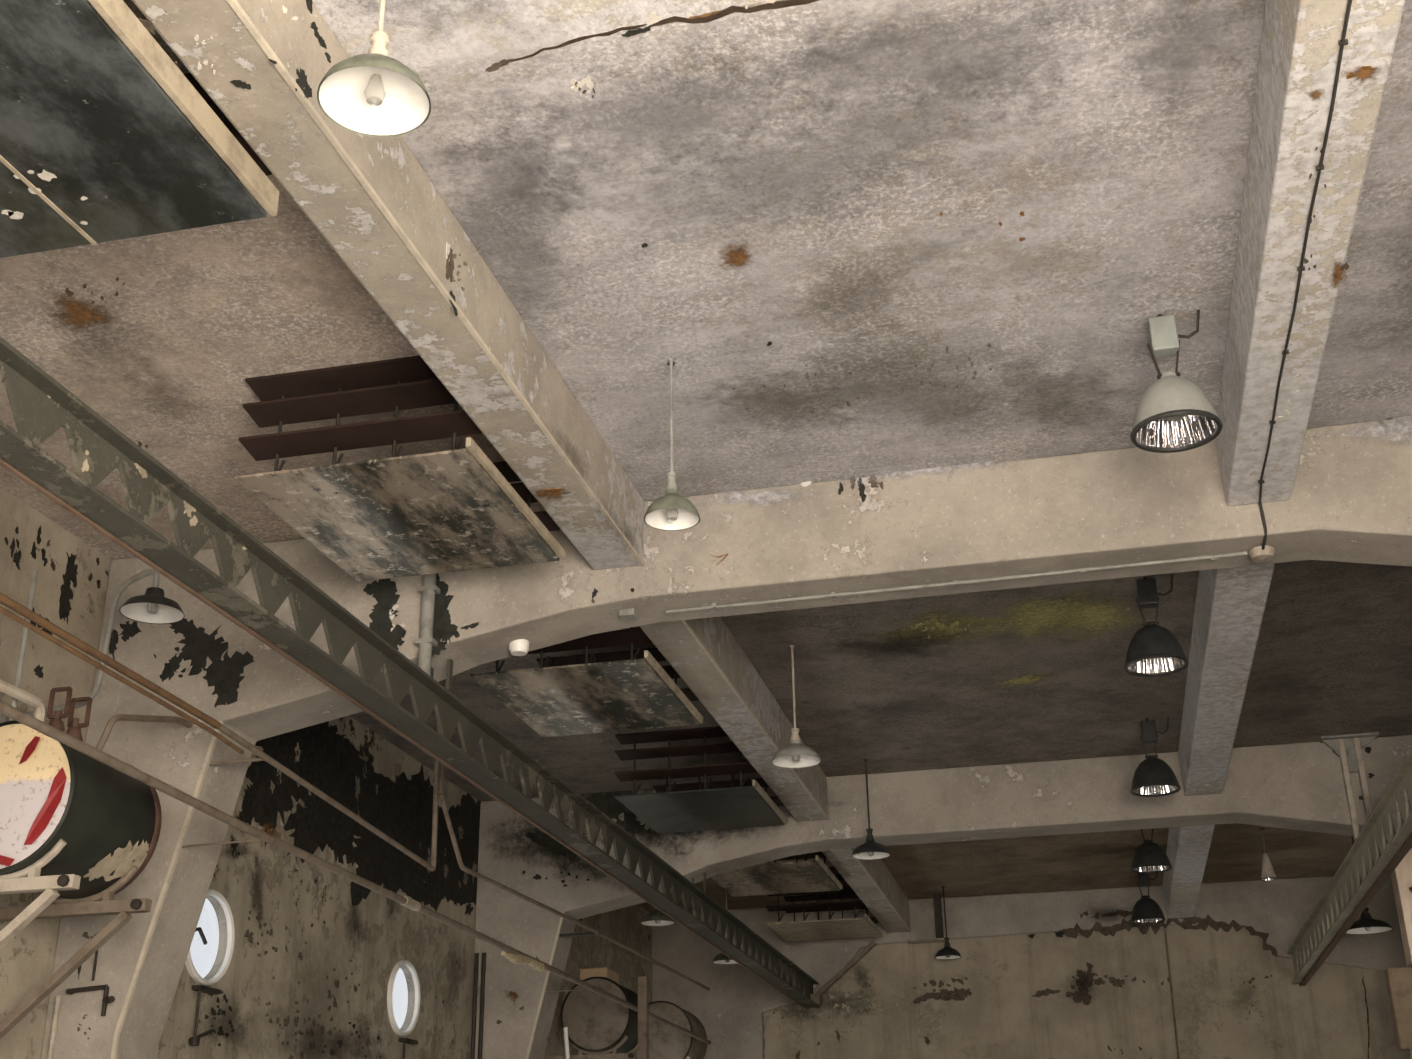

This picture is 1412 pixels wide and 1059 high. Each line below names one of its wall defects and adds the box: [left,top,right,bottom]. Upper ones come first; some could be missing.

peeling [282,0,331,63]
crack [485,0,819,72]
peeling [295,68,312,99]
corrosion [723,246,748,267]
peeling [108,620,142,660]
peeling [153,618,254,708]
peeling [363,578,406,650]
peeling [432,573,479,656]
damp [879,593,1137,640]
peeling [239,721,481,916]
spalling [912,977,972,1004]
spalling [1032,962,1169,1005]